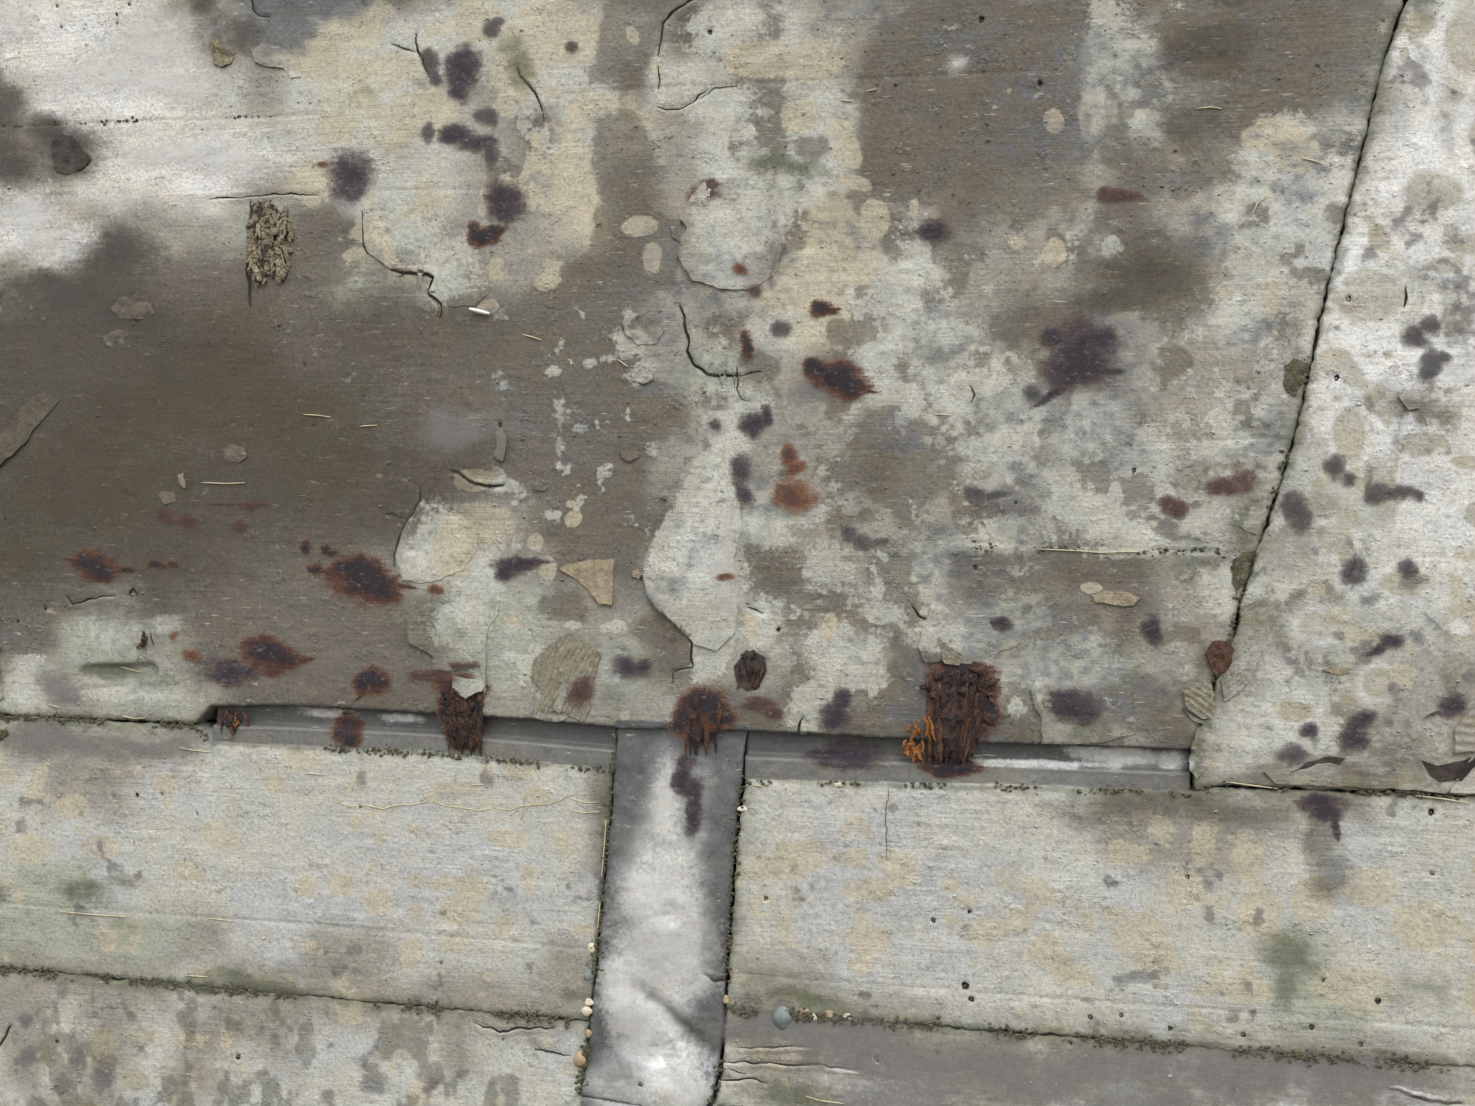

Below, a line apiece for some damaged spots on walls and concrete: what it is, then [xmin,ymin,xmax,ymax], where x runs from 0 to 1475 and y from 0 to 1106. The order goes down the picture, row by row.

damp [15,227,155,325]
crack [362,212,453,321]
rust [803,357,878,402]
rust [707,404,820,515]
rust [63,550,178,583]
rust [300,540,444,605]
rust [136,631,315,687]
rust [330,661,491,756]
spalling [530,633,601,722]
crack [671,638,701,684]
rust [666,650,782,836]
rust [901,661,1004,778]